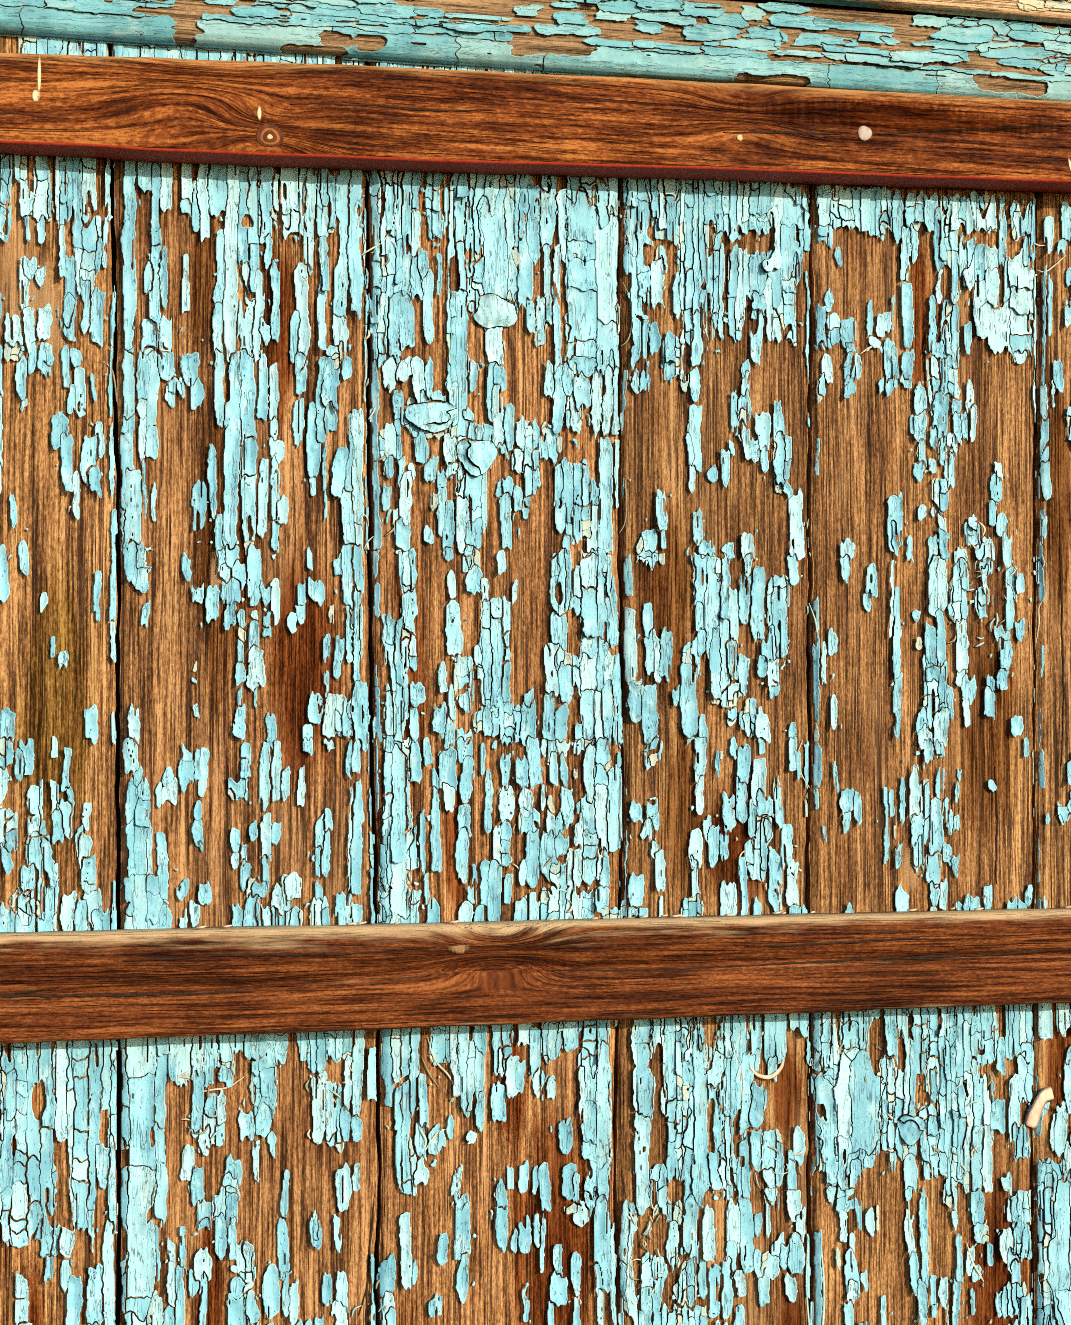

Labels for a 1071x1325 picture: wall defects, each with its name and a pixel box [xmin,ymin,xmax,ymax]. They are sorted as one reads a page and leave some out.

peeling [0,0,1071,102]